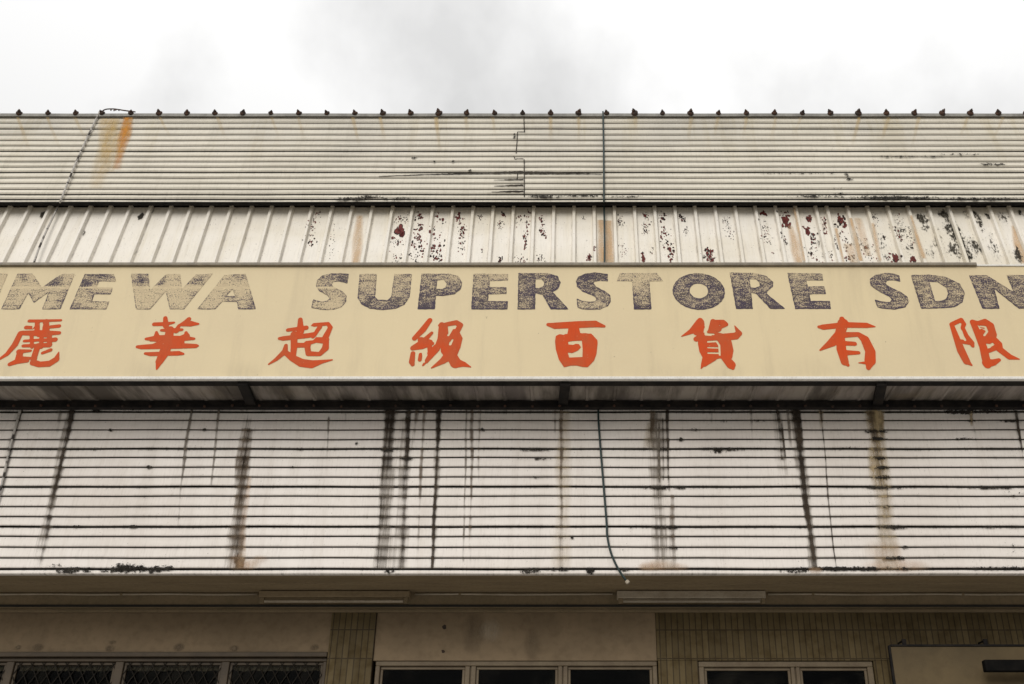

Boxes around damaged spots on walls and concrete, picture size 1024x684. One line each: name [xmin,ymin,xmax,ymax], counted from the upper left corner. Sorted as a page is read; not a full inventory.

corrosion [112,118,131,156]
damp [40,410,75,550]
damp [228,419,251,561]
damp [376,410,442,574]
damp [643,410,694,560]
damp [750,410,908,573]